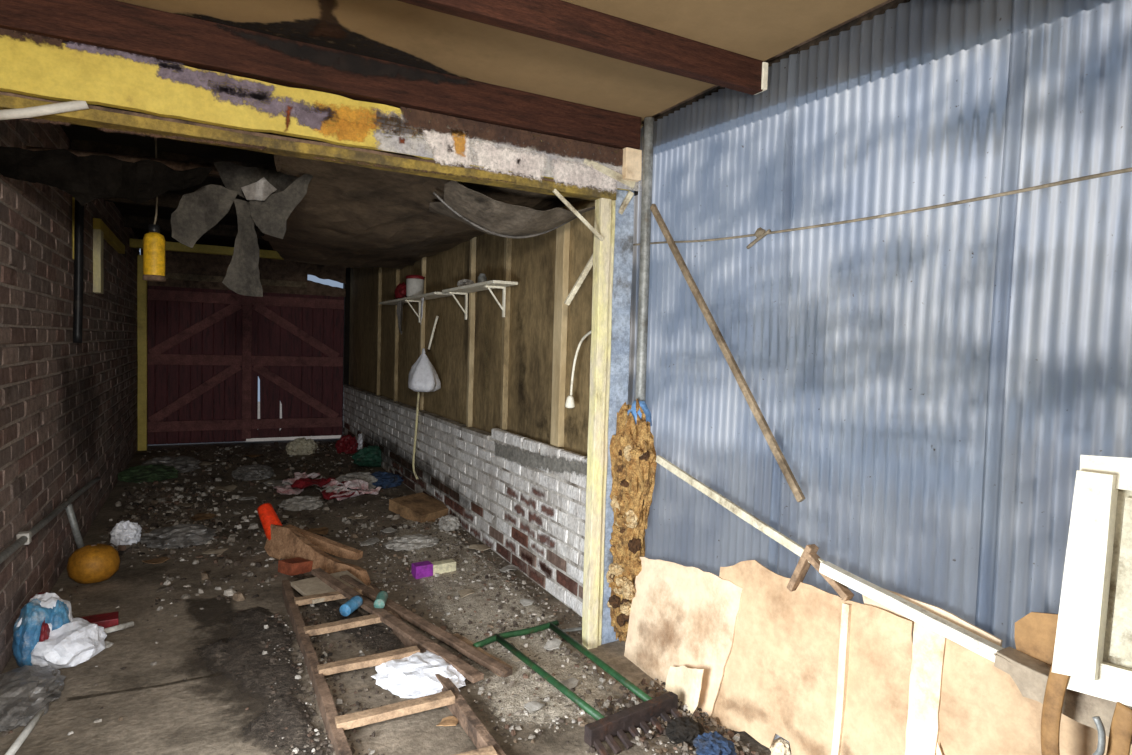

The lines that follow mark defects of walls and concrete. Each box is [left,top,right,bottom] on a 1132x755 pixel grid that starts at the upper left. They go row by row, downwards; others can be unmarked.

peeling [0,28,643,193]
water stain [173,0,474,85]